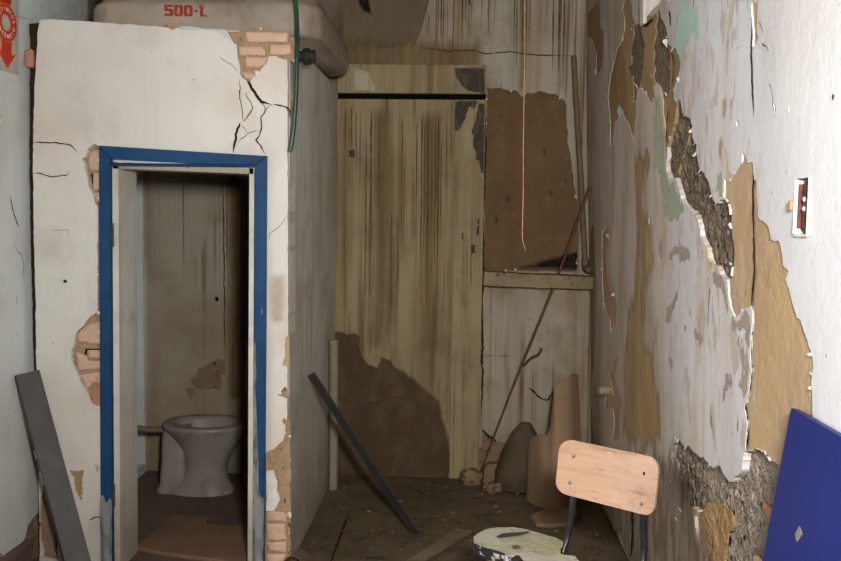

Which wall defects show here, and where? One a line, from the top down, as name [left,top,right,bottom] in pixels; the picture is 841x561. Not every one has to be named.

flaking render [73,267,100,409]
crack [219,56,291,155]
flaking render [228,28,295,82]
flaking render [253,342,292,561]
peeling [335,332,406,402]
flaking render [343,0,429,49]
leakage [377,113,398,332]
leakage [345,40,479,65]
flaking render [454,67,578,272]
leakage [601,149,709,561]
peeling [607,0,813,561]
crack [745,174,755,449]